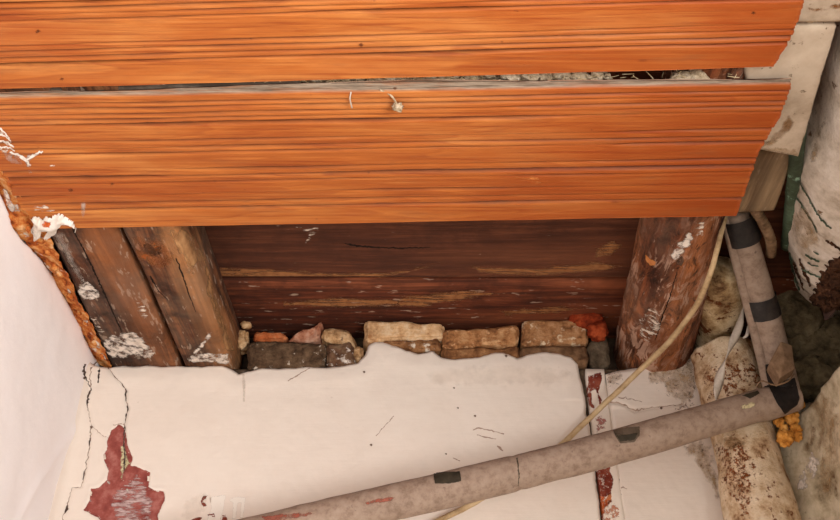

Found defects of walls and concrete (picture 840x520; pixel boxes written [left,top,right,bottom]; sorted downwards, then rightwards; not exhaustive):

crack [62,362,129,520]
peeling [84,425,165,520]
crack [610,397,683,411]
rust [704,361,760,399]
rust [713,440,757,520]